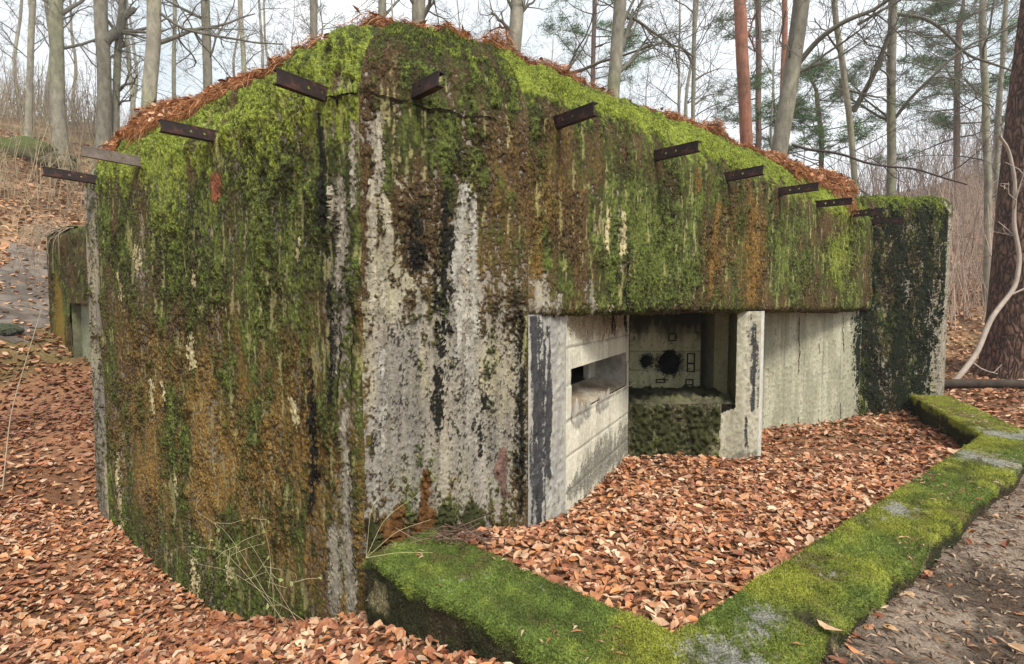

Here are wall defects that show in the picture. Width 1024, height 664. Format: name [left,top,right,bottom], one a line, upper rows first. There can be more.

crack [326,92,497,121]
rust [210,170,222,205]
water stain [377,349,390,474]
water stain [404,180,490,457]
water stain [518,310,553,526]
water stain [732,315,759,460]